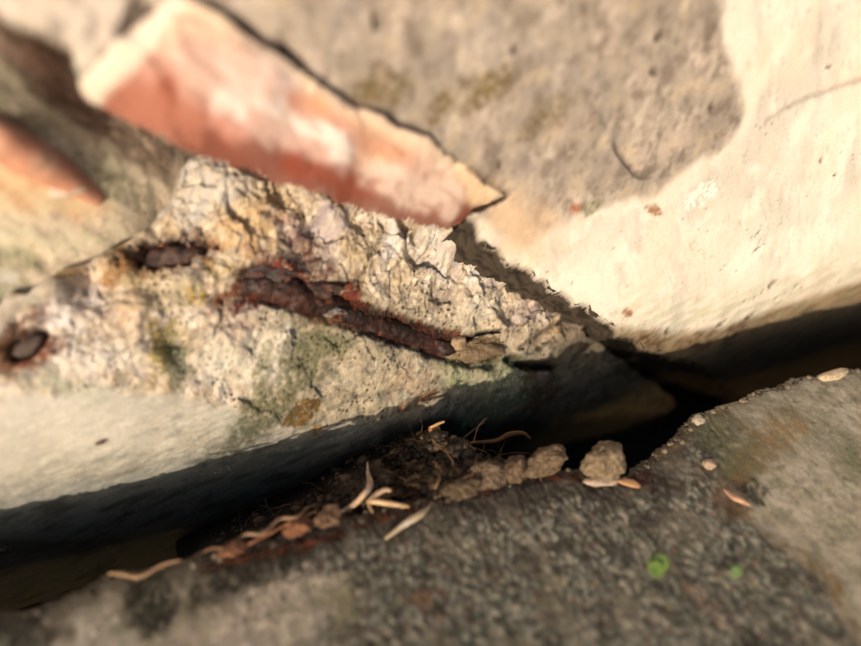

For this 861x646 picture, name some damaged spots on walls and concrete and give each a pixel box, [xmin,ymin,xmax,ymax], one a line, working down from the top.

crack [764,78,861,125]
spalling [0,0,678,437]
corrosion [102,234,219,286]
corrosion [259,234,336,283]
corrosion [0,308,66,372]
corrosion [211,268,276,313]
corrosion [299,312,498,370]
corrosion [335,281,467,340]
crack [442,219,741,403]